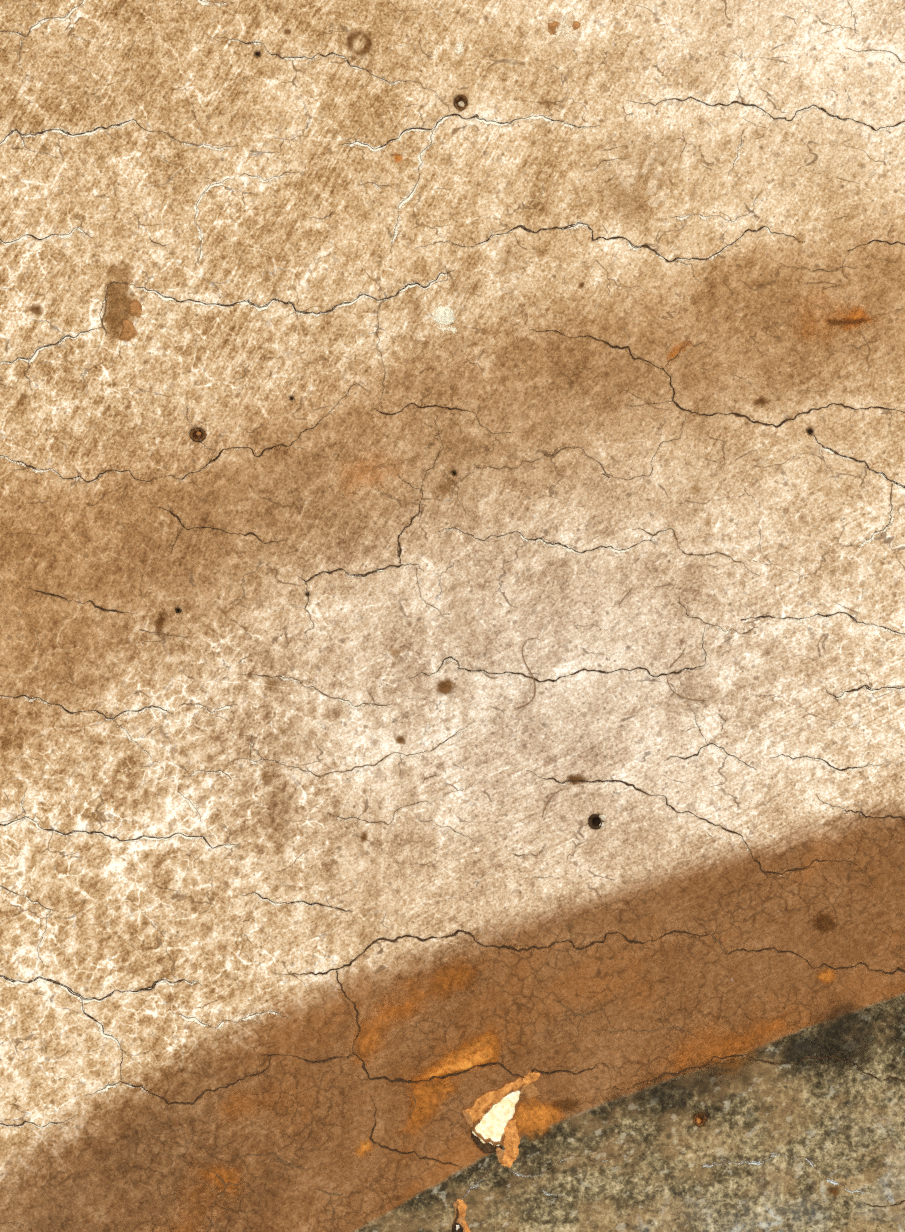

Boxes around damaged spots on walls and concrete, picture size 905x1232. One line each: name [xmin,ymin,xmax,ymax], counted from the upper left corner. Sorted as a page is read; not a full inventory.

crack [0,37,905,644]
crack [409,596,905,683]
crack [0,695,238,758]
crack [0,721,474,849]
crack [527,770,856,876]
crack [667,710,883,771]
water stain [103,999,362,1232]
crack [0,886,905,1207]
corrosion [412,1033,498,1123]
spalling [461,1069,542,1168]
corrosion [516,1106,557,1129]
water stain [315,820,905,1232]